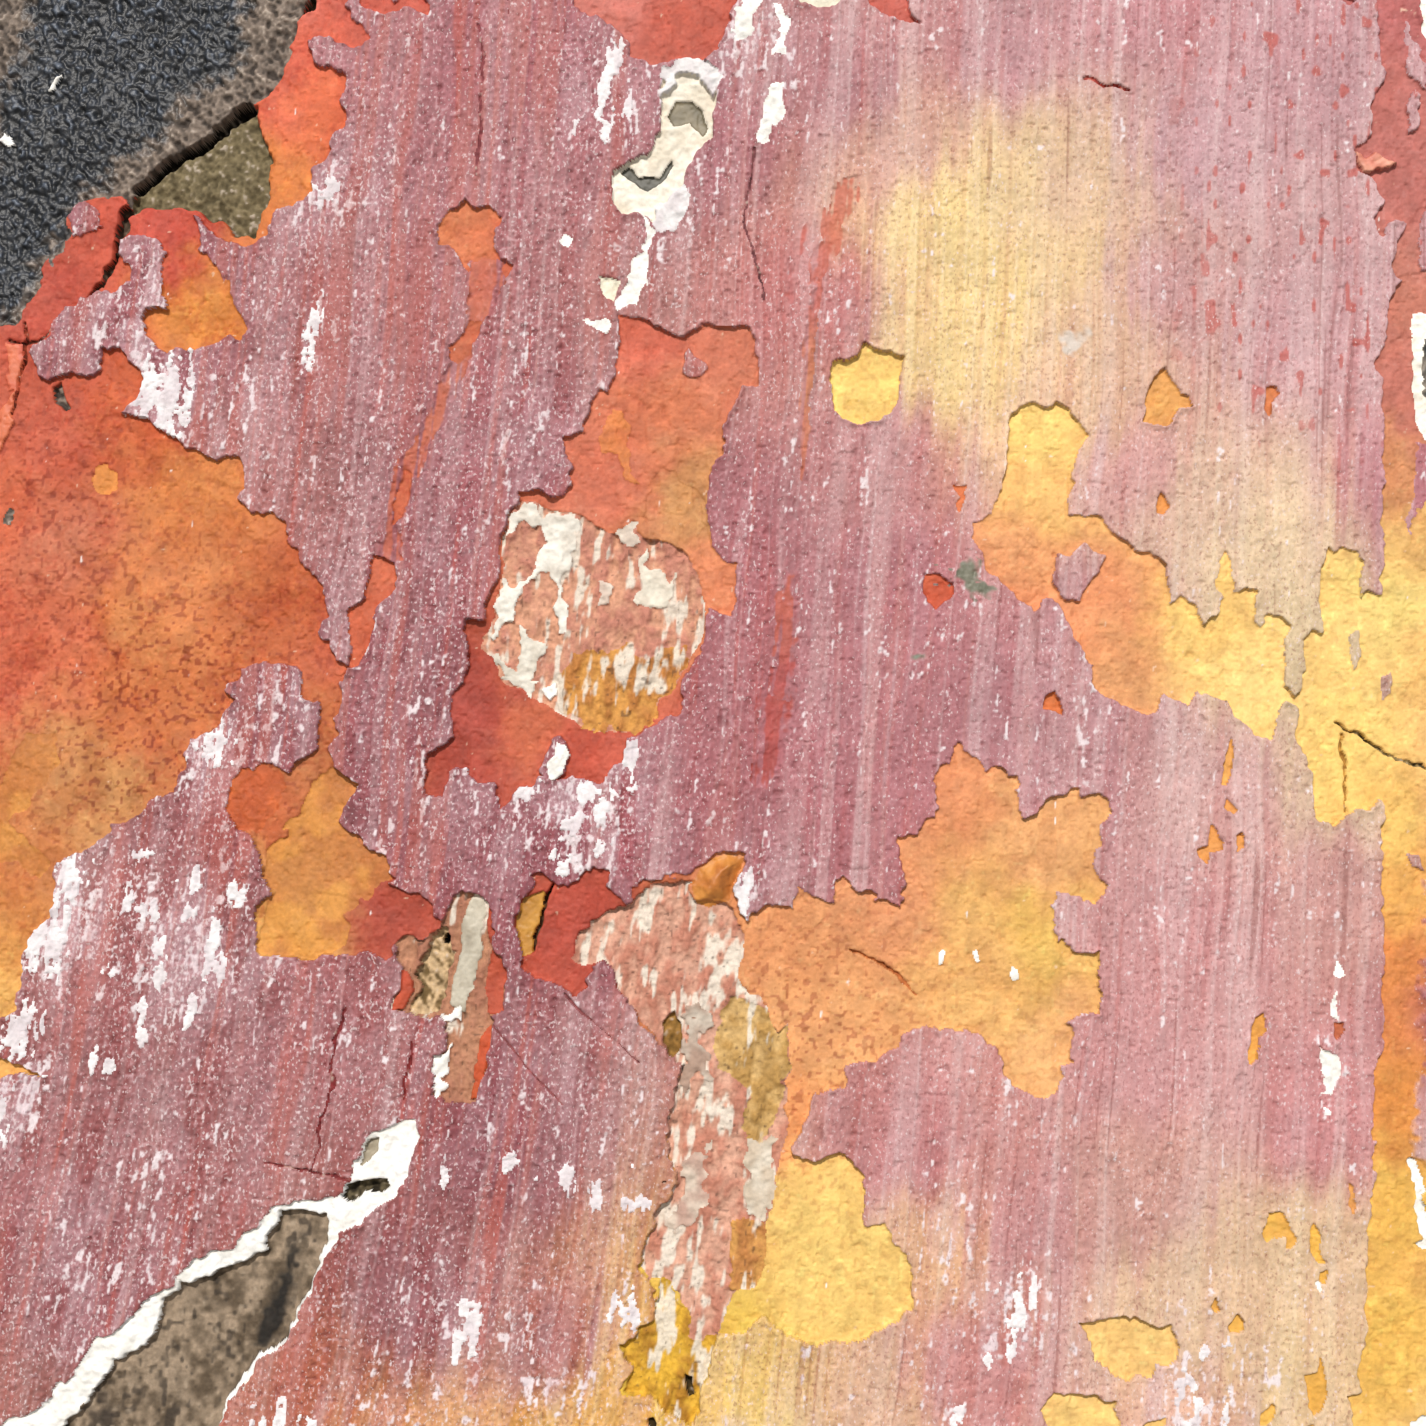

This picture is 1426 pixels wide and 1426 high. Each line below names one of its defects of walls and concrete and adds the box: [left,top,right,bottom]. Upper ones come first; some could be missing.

crack [92,102,258,294]
peeling [0,0,1121,1426]
peeling [953,0,1426,1426]
crack [1334,722,1426,813]